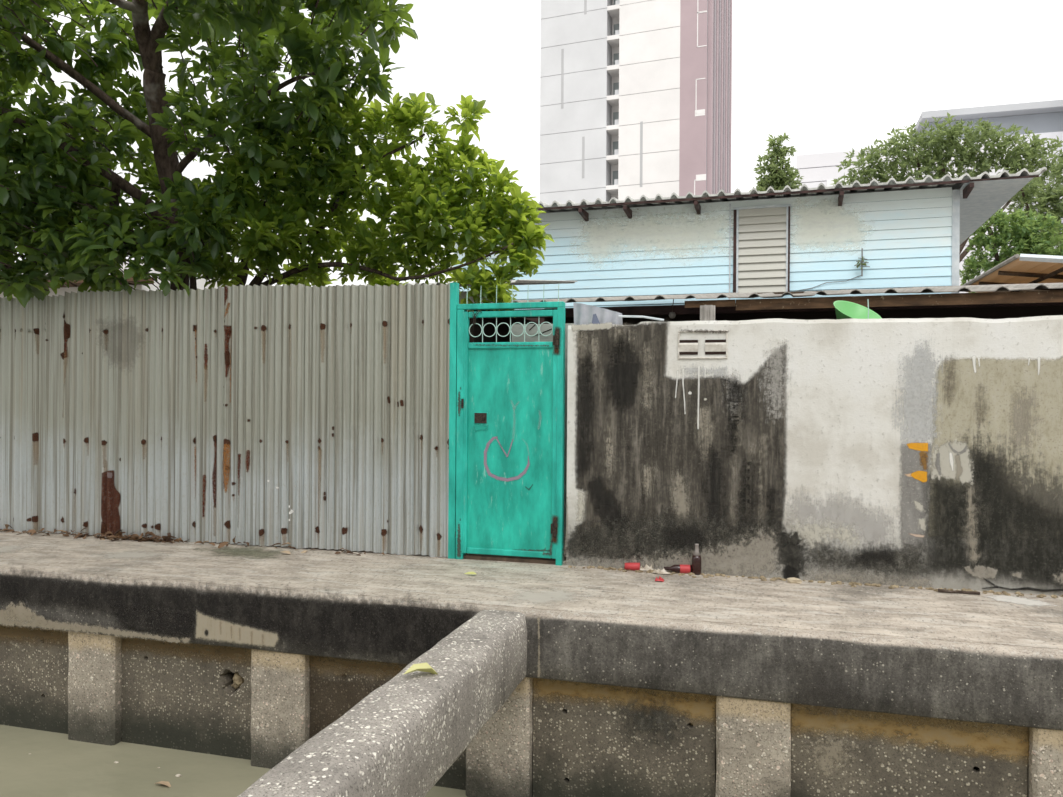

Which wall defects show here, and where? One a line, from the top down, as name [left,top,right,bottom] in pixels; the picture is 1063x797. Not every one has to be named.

rust [61,314,70,360]
rust [192,435,250,528]
water stain [562,321,1063,589]
peeling [894,341,967,551]
water stain [0,570,472,662]
water stain [988,595,1056,606]